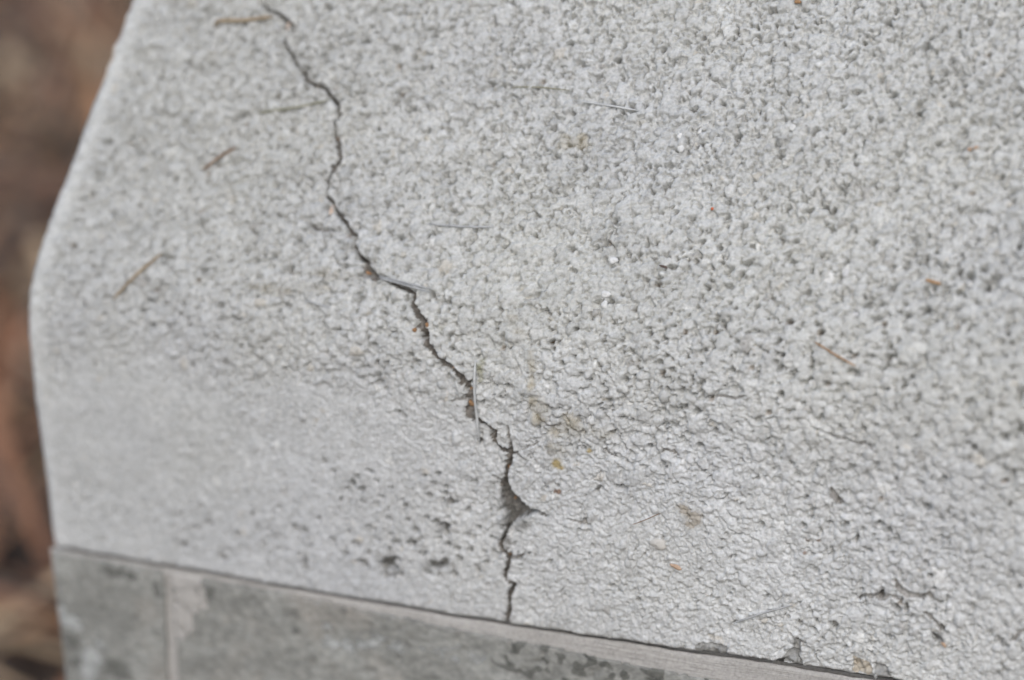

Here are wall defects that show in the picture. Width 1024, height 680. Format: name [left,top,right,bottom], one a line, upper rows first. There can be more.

crack [262,6,591,620]